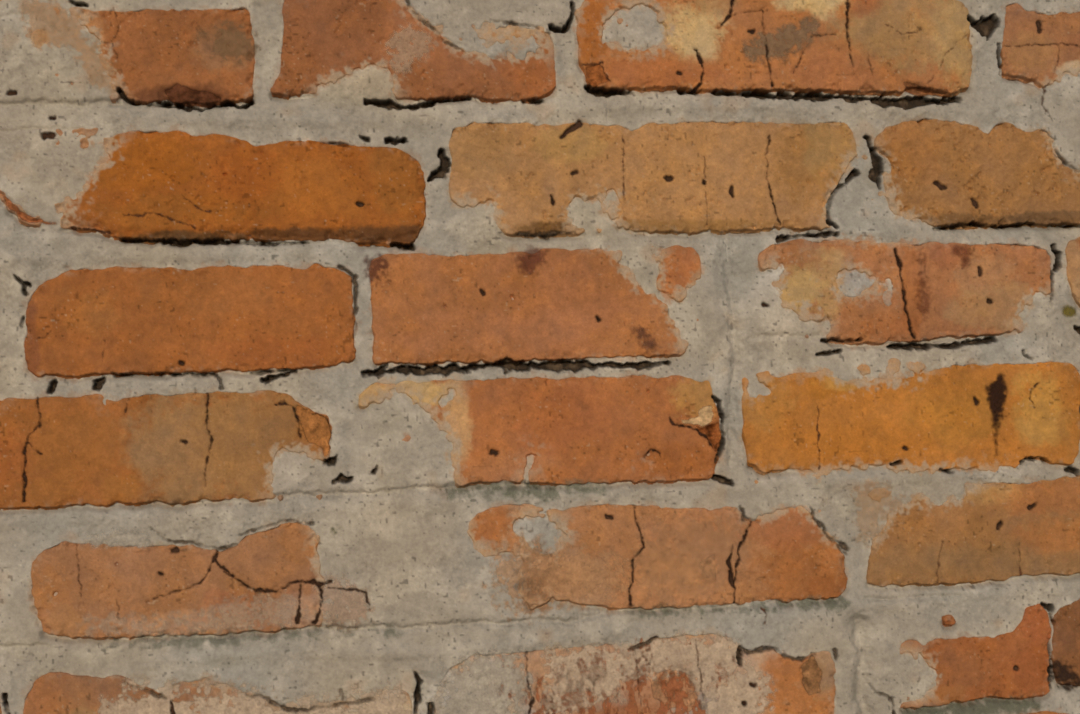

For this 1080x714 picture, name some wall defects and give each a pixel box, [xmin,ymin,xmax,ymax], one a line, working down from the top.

crack [690,49,704,95]
crack [721,0,734,26]
crack [846,2,871,66]
crack [894,248,915,339]
crack [23,397,42,502]
crack [205,394,213,471]
crack [154,553,370,624]
crack [629,507,645,606]
crack [726,522,752,603]